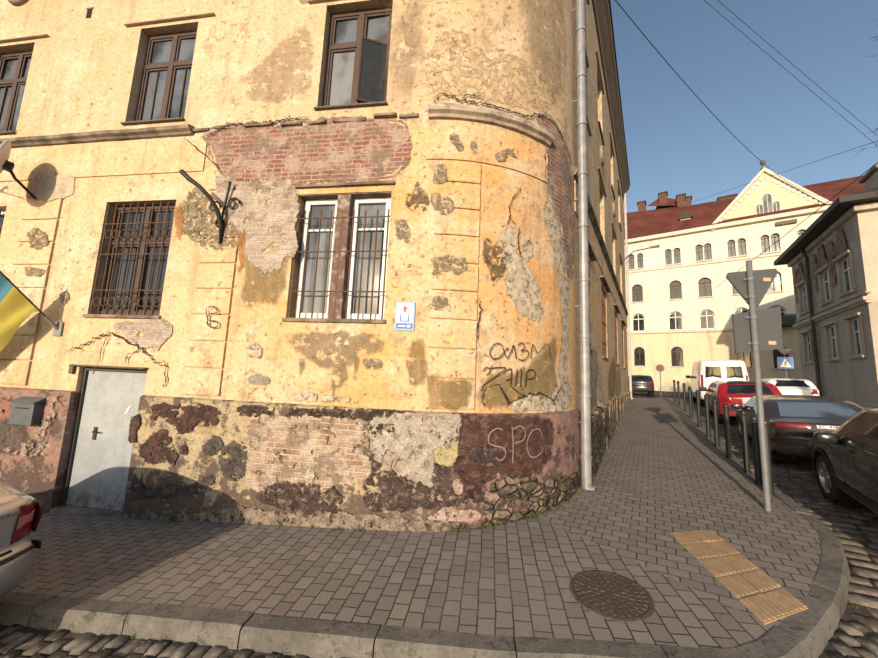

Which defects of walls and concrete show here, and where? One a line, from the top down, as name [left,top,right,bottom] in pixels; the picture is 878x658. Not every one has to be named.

spalling [173,115,413,277]
peeling [424,29,575,413]
crack [505,183,532,259]
crack [63,331,167,387]
peeling [113,318,172,351]
spalling [126,392,463,503]
damp [255,479,342,518]
flaking render [124,471,580,532]